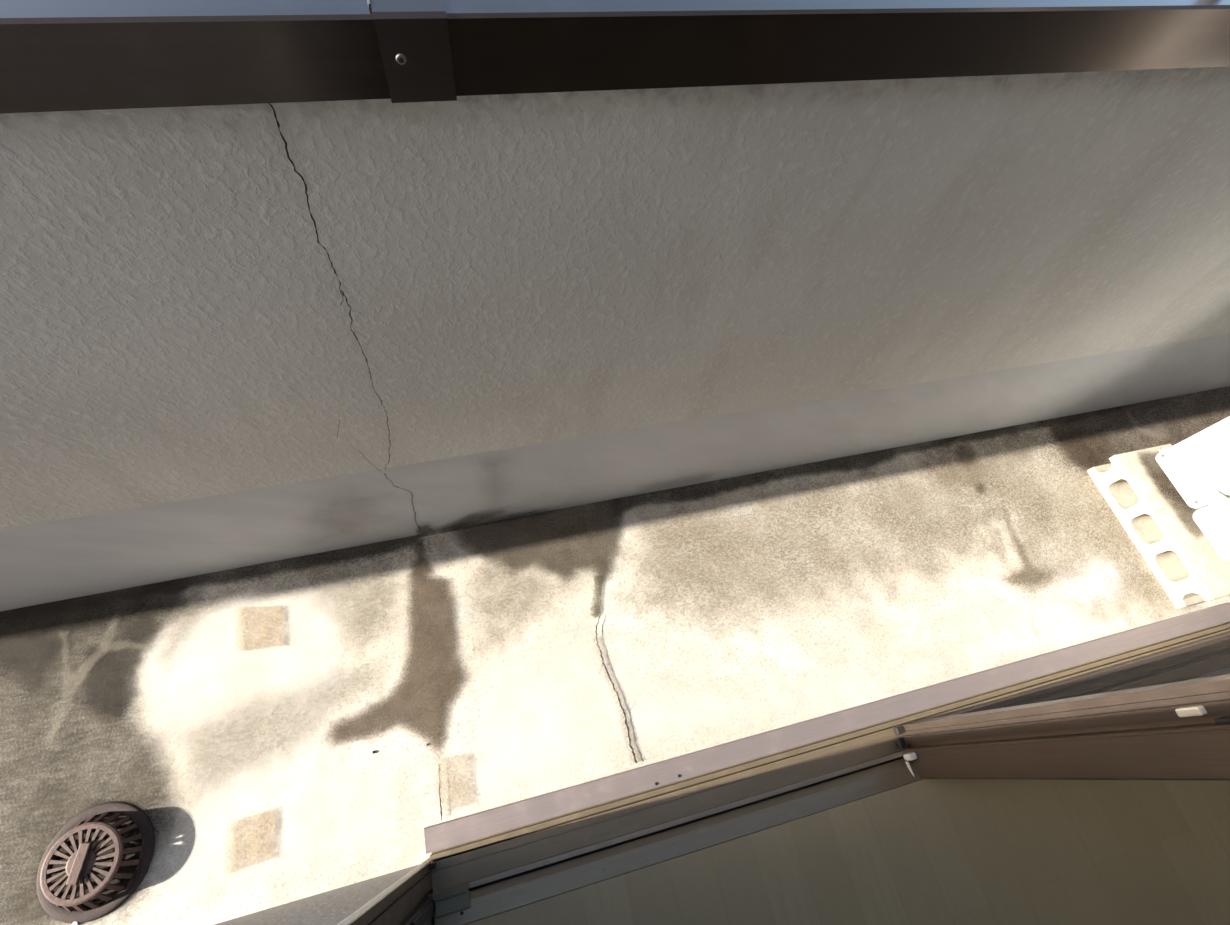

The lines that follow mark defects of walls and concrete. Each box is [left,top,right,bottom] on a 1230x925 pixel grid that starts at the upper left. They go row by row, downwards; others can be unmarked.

water stain [0,534,462,925]
crack [268,103,426,536]
crack [595,615,639,763]
water stain [451,386,1230,620]